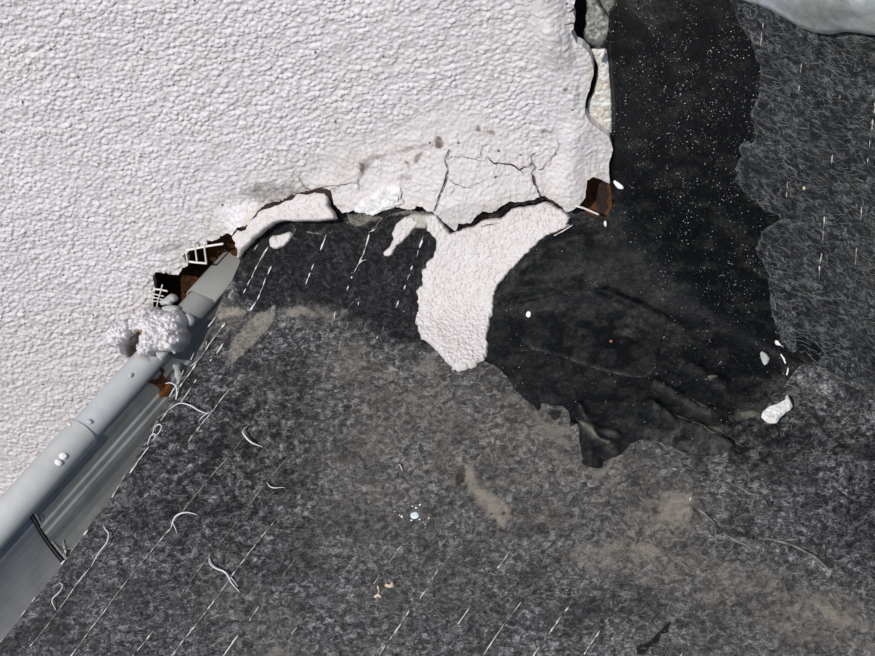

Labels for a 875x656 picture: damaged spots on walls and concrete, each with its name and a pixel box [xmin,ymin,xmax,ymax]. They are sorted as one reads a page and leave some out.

flaking render [354,186,404,215]
crack [433,141,568,231]
spalling [575,177,612,222]
flaking render [153,193,338,327]
corrosion [148,367,171,397]
damp [534,410,570,448]